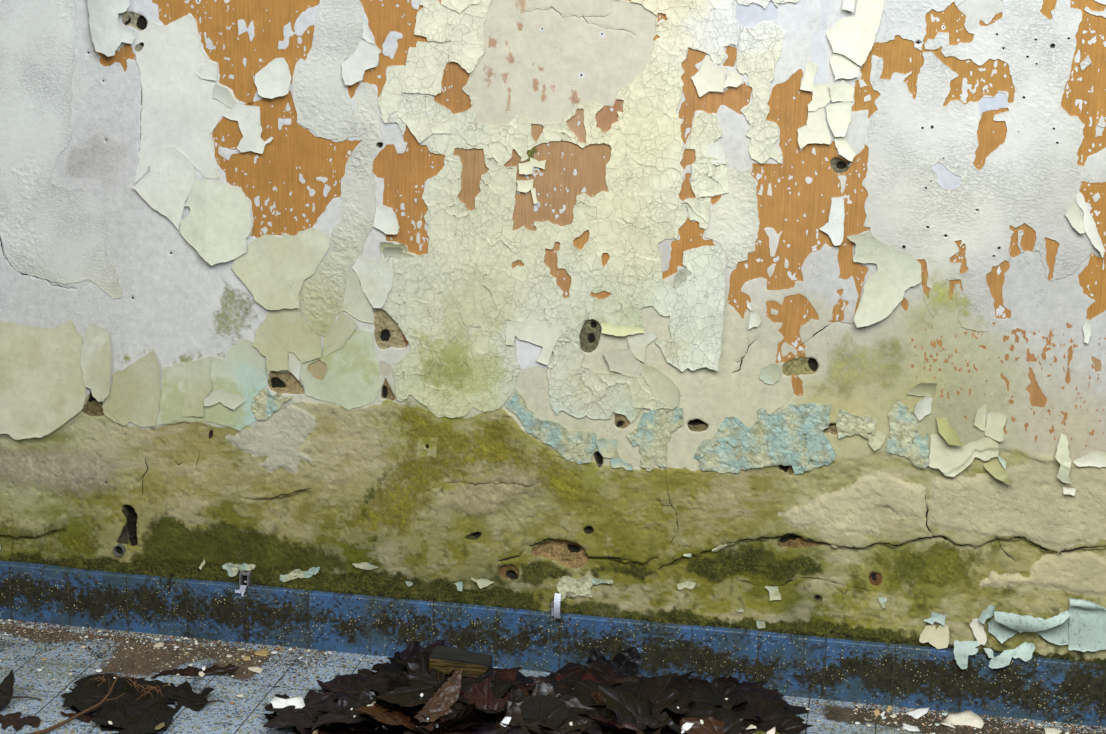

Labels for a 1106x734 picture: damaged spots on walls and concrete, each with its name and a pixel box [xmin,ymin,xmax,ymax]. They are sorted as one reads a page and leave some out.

crack [525,7,633,34]
peeling [1040,0,1057,19]
peeling [1061,0,1106,166]
peeling [0,0,1025,440]
peeling [906,181,1106,496]
spalling [593,452,603,467]
crack [498,477,1106,570]
crack [11,530,71,553]
crack [737,574,872,594]